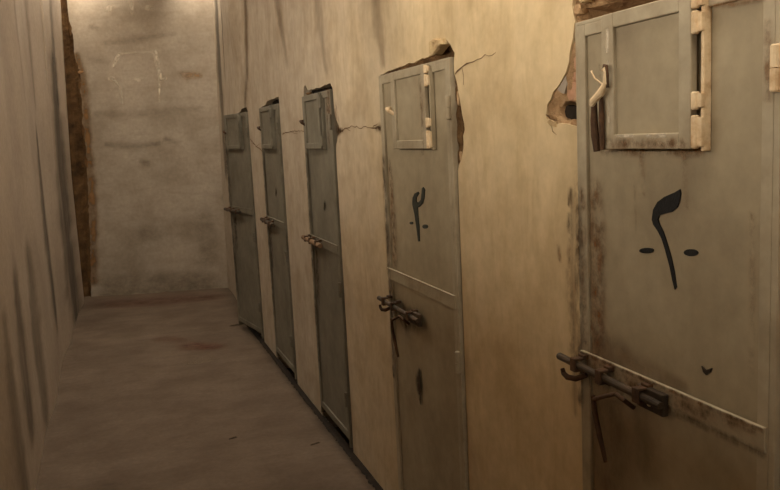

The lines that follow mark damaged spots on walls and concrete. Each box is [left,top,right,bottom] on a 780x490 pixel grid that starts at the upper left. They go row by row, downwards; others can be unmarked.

flaking render [60,0,97,297]
crack [338,124,381,133]
flaking render [455,80,465,164]
crack [455,52,496,85]
flaking render [546,42,577,133]